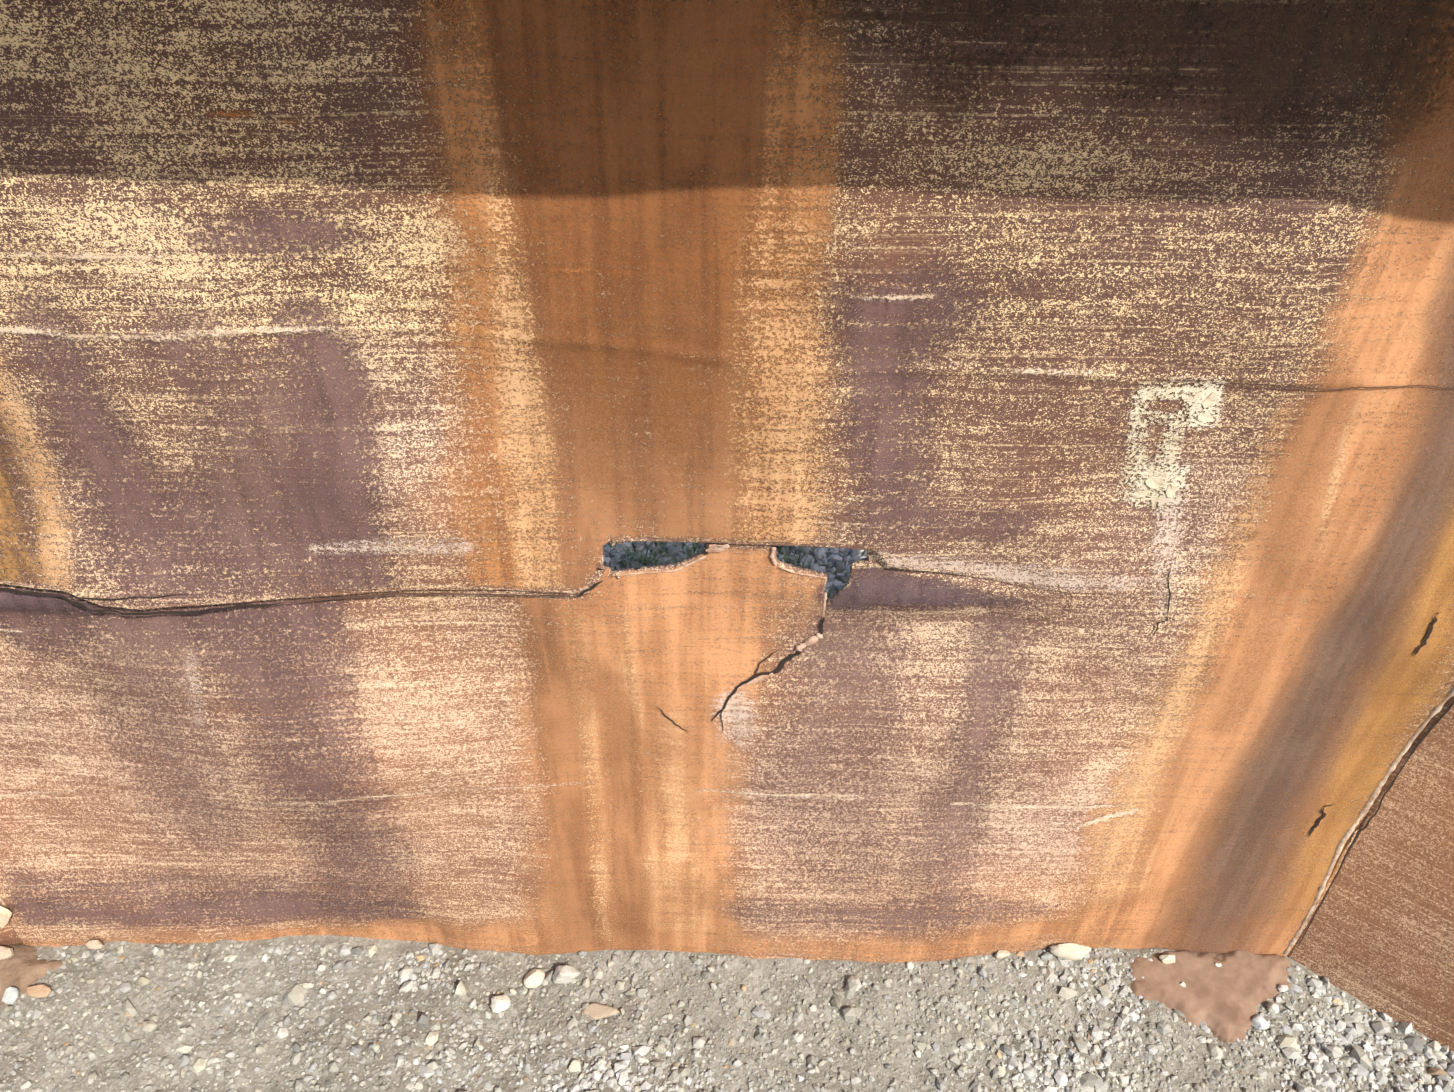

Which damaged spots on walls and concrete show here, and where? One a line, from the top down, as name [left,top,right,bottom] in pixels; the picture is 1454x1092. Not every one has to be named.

corrosion [0,339,84,595]
leakage [0,292,420,937]
crack [0,580,602,615]
crack [658,592,827,733]
corrosion [232,0,1454,963]
leakage [731,610,1057,962]
leakage [821,261,1044,543]
crack [1296,701,1454,949]
crack [1413,613,1439,656]